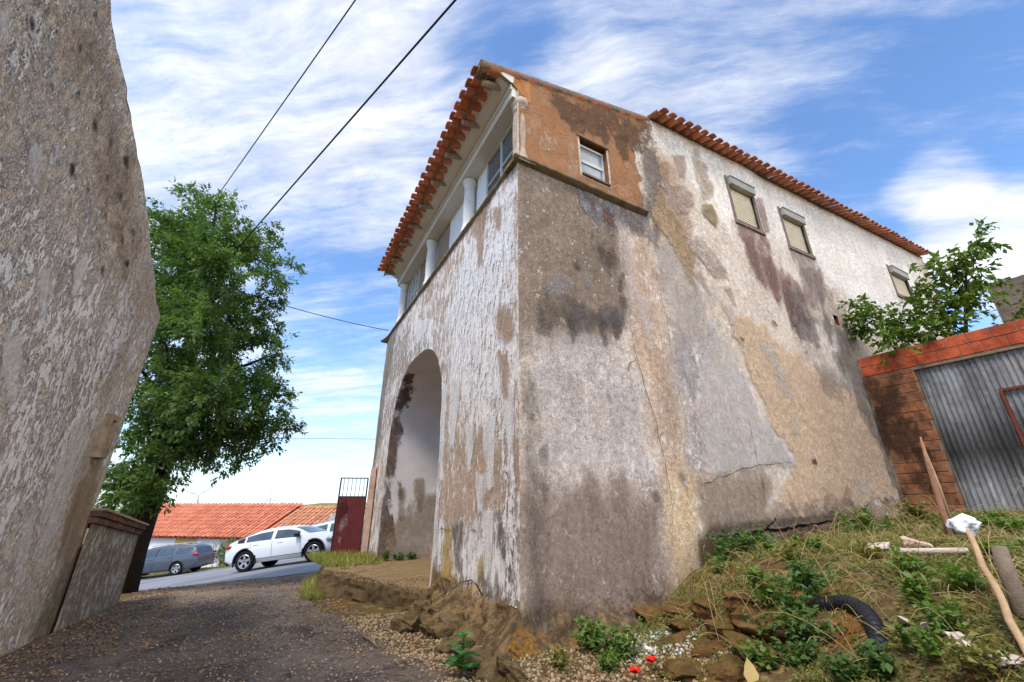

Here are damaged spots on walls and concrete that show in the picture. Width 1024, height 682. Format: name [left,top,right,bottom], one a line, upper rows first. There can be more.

peeling [433,182,517,608]
water stain [537,93,664,348]
crack [695,422,855,539]
water stain [732,198,959,502]